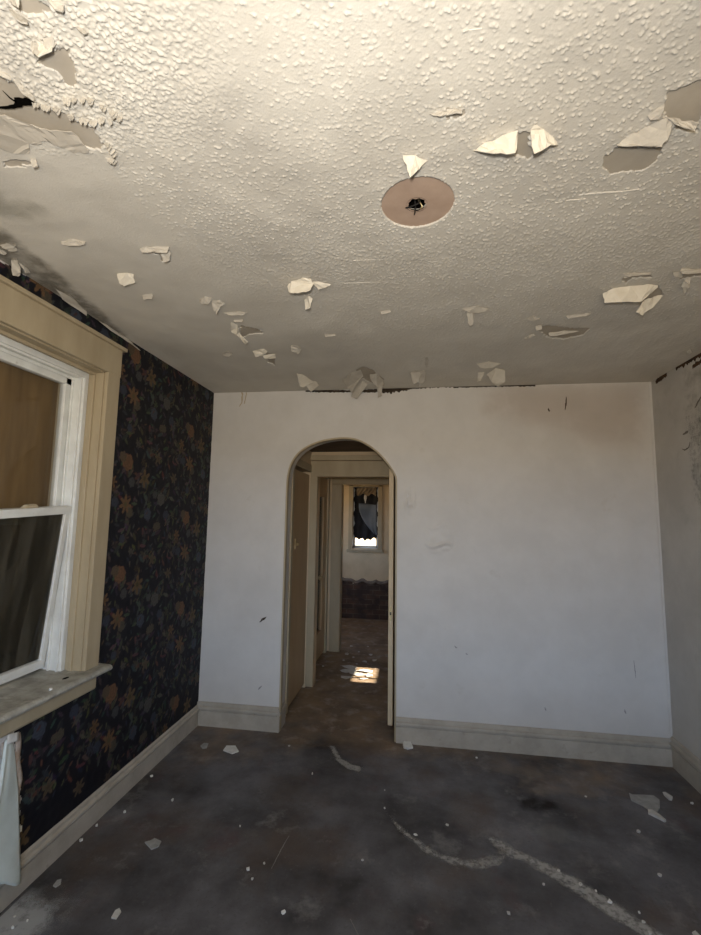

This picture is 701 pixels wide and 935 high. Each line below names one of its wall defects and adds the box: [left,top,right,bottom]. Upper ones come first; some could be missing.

peeling [9,0,64,24]
peeling [0,37,123,168]
peeling [473,124,558,159]
peeling [602,80,701,174]
peeling [0,241,30,277]
peeling [140,246,171,263]
peeling [117,273,135,286]
peeling [602,272,663,316]
peeling [52,283,139,350]
peeling [199,296,276,364]
peeling [524,313,591,339]
peeling [477,361,505,386]